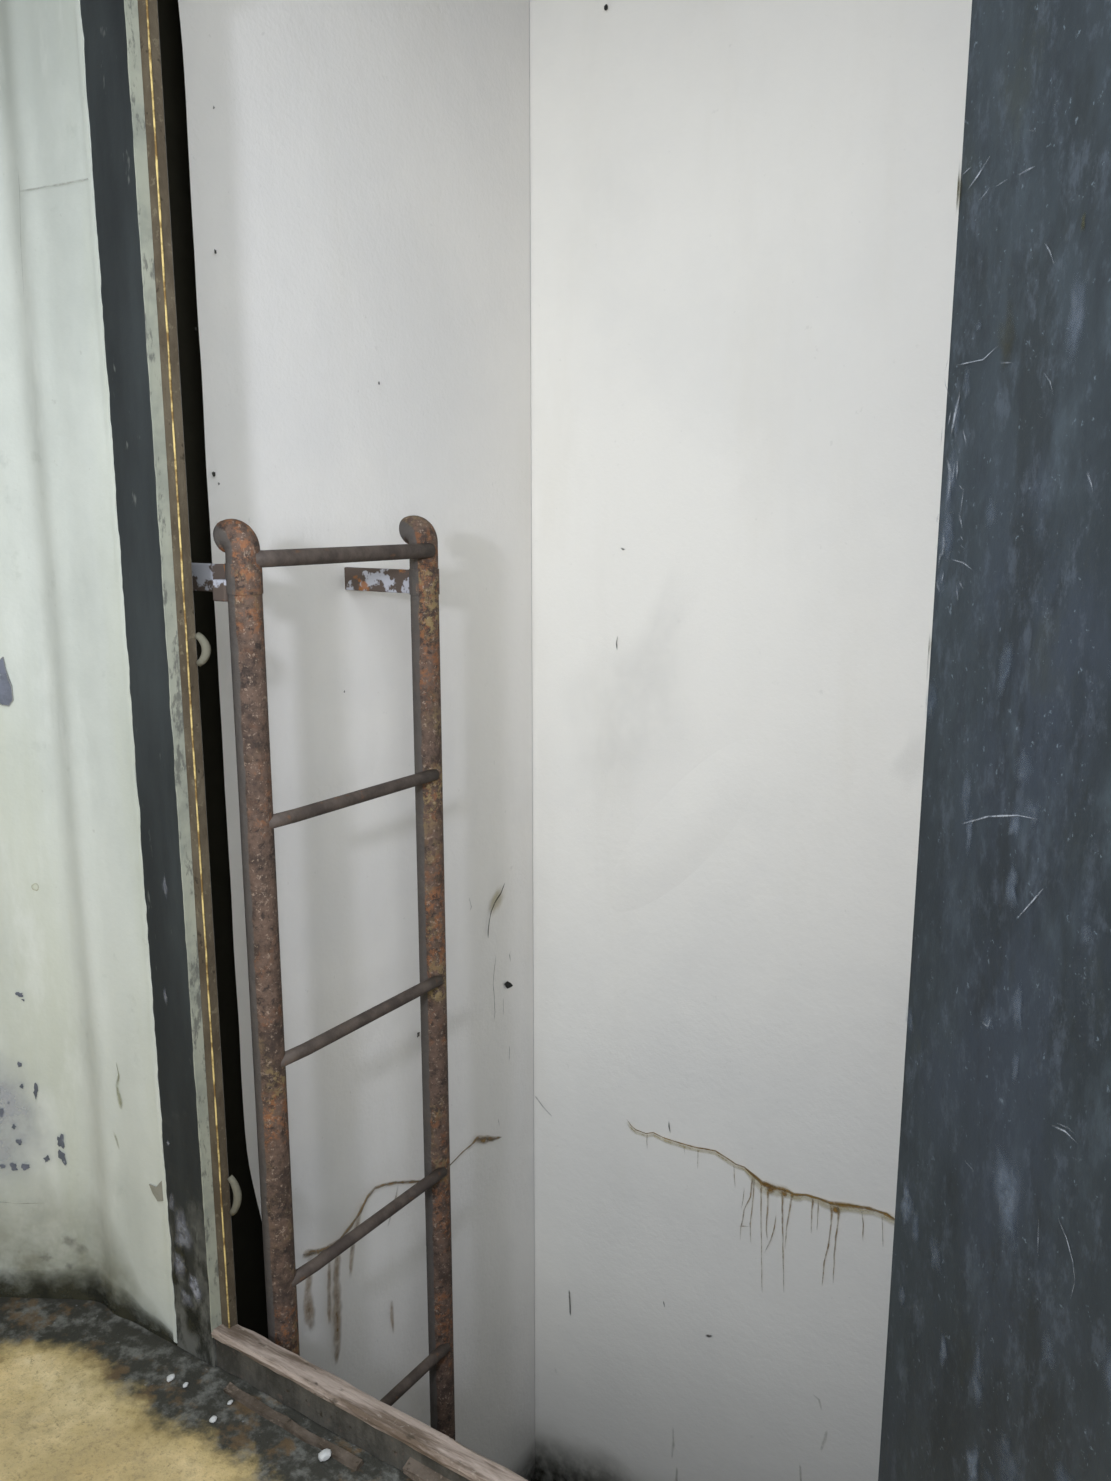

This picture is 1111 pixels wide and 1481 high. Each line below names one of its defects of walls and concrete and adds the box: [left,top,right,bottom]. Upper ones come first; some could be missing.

peeling [0,657,13,706]
peeling [0,1062,38,1145]
peeling [0,1134,67,1171]
crack [629,1123,895,1285]
crack [306,1136,500,1359]
damp [0,1256,180,1348]
damp [525,1456,604,1481]